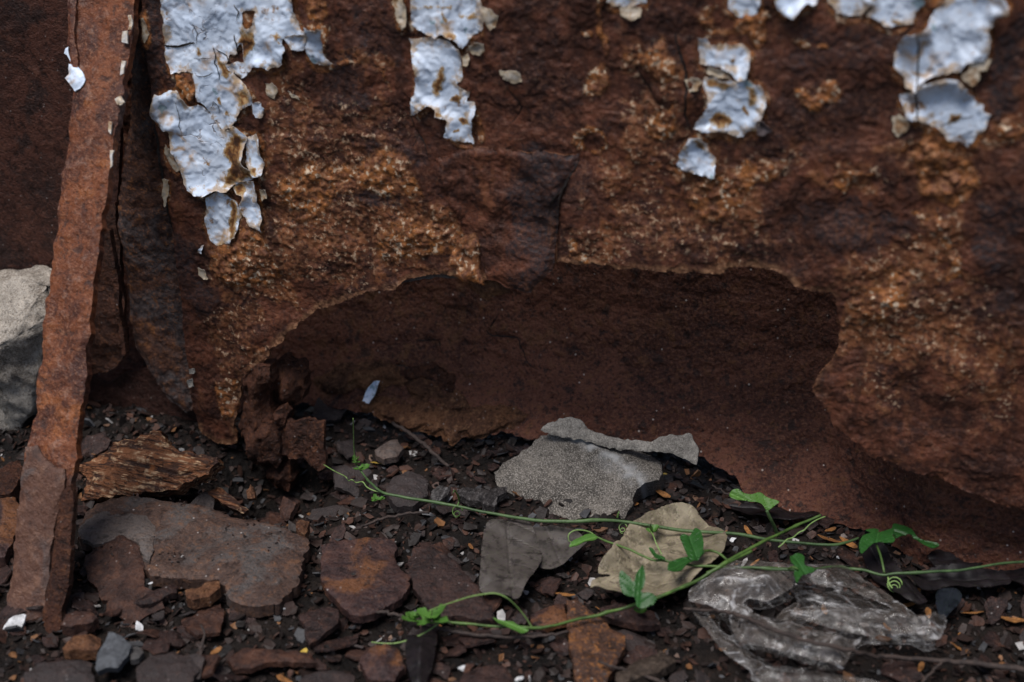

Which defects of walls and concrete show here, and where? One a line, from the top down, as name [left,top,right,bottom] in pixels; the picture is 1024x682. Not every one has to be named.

peeling [122,0,334,254]
corrosion [276,144,422,223]
peeling [391,0,580,293]
corrosion [623,35,678,83]
peeling [675,36,772,182]
corrosion [697,7,769,50]
peeling [723,0,1013,152]
corrosion [377,214,510,301]
corrosion [847,261,925,324]
peeling [363,380,380,404]
corrosion [312,360,529,446]
peeling [541,417,699,465]